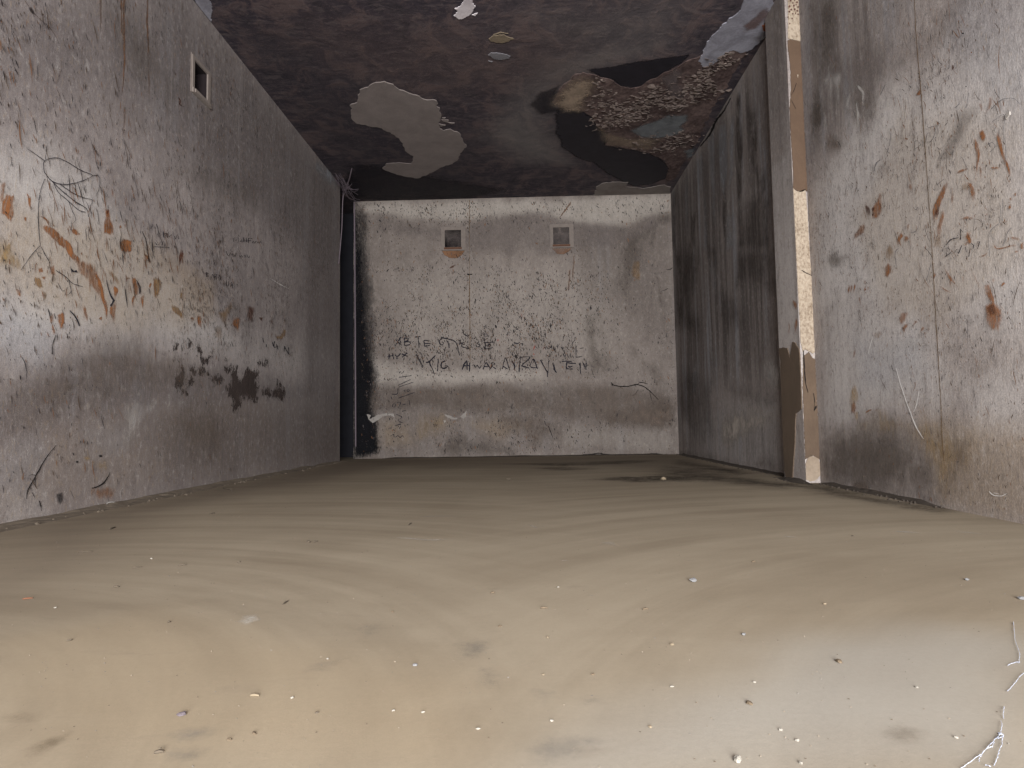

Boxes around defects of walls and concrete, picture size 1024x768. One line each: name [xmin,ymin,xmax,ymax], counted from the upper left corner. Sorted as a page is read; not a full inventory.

peeling [454,0,478,19]
peeling [553,0,774,196]
peeling [350,81,467,178]
rust [959,131,1010,174]
rust [2,184,31,221]
rust [866,195,881,217]
rust [933,187,945,228]
rust [104,210,131,252]
peeling [779,0,820,482]
rust [42,217,160,320]
leakage [343,165,500,459]
rust [986,283,1005,329]